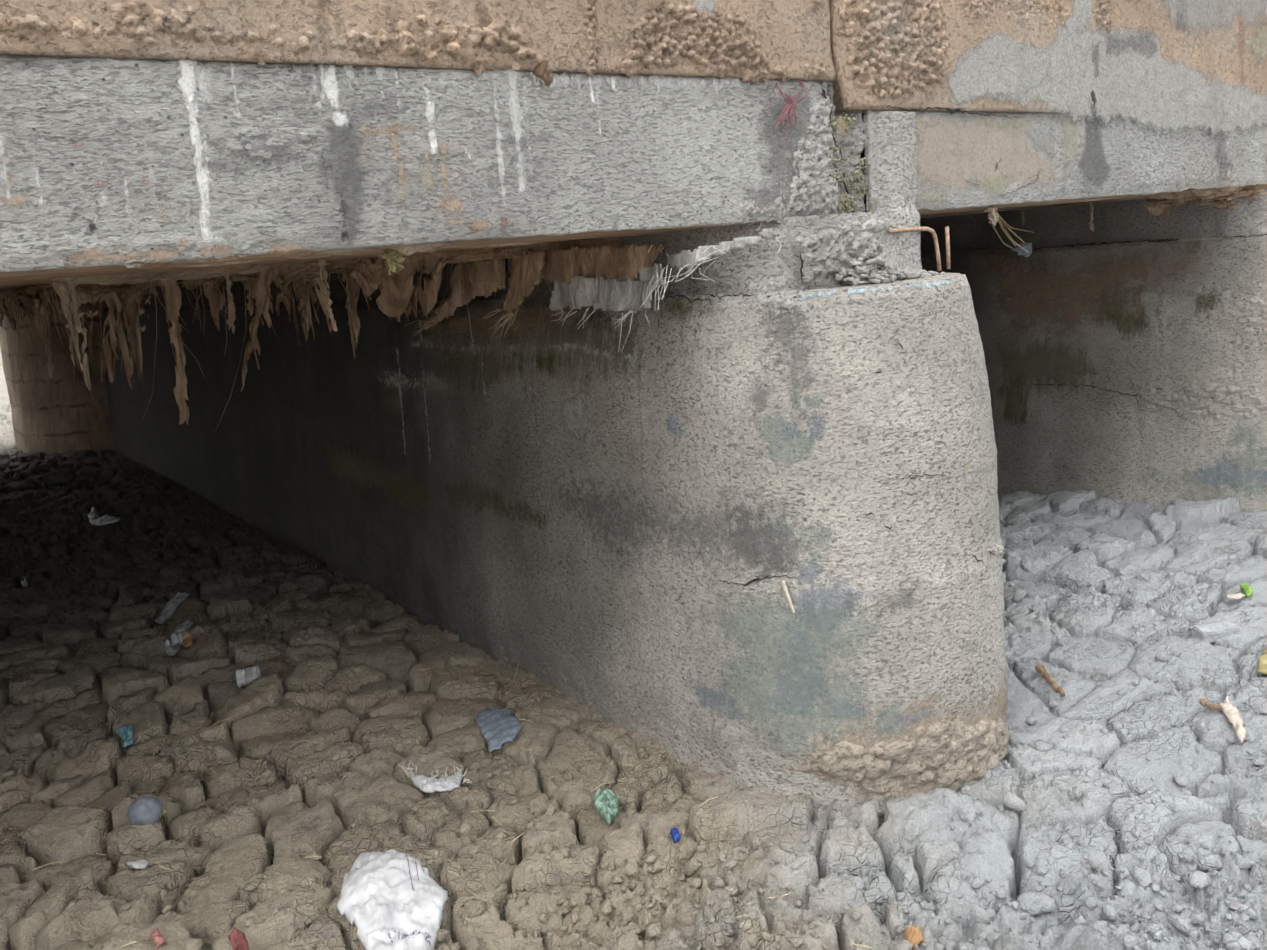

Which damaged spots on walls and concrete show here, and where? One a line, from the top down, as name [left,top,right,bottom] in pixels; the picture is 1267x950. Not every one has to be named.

water stain [178,60,213,240]
water stain [314,64,401,240]
water stain [423,78,438,154]
water stain [1081,114,1109,183]
peeling [948,0,1267,135]
crack [718,575,797,586]